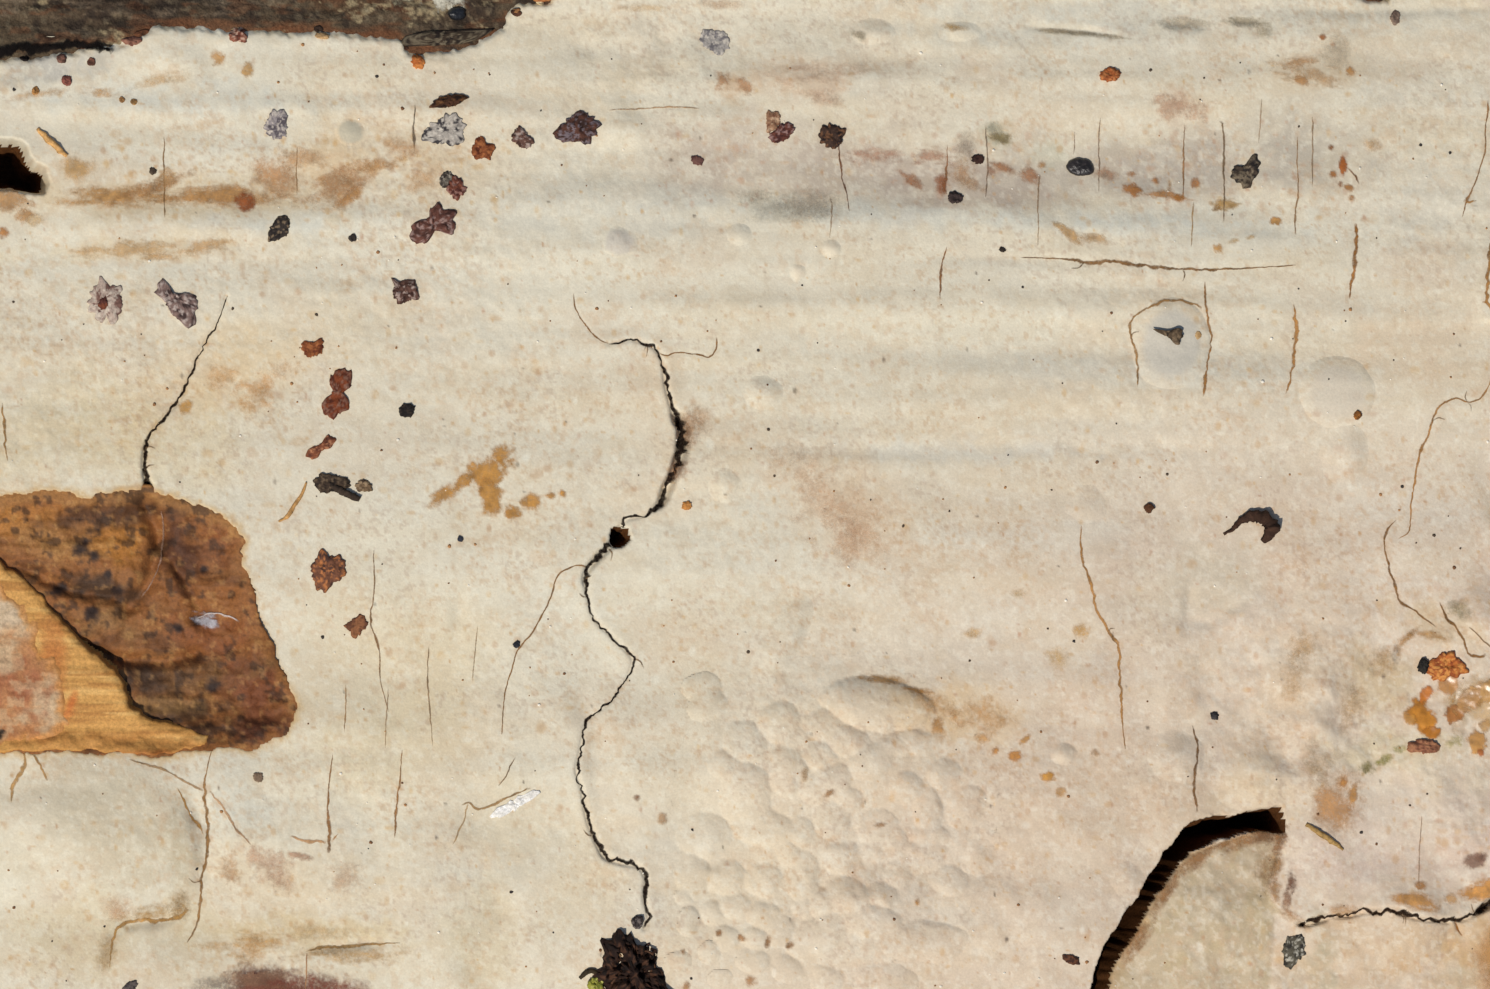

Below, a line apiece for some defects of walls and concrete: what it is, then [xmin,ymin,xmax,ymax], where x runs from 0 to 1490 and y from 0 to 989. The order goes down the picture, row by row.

peeling [121,36,142,46]
peeling [229,27,248,43]
peeling [699,29,730,56]
peeling [1390,10,1400,26]
crack [142,299,226,484]
peeling [0,484,297,758]
crack [472,296,718,927]
crack [1300,819,1490,934]
peeling [1281,934,1306,970]